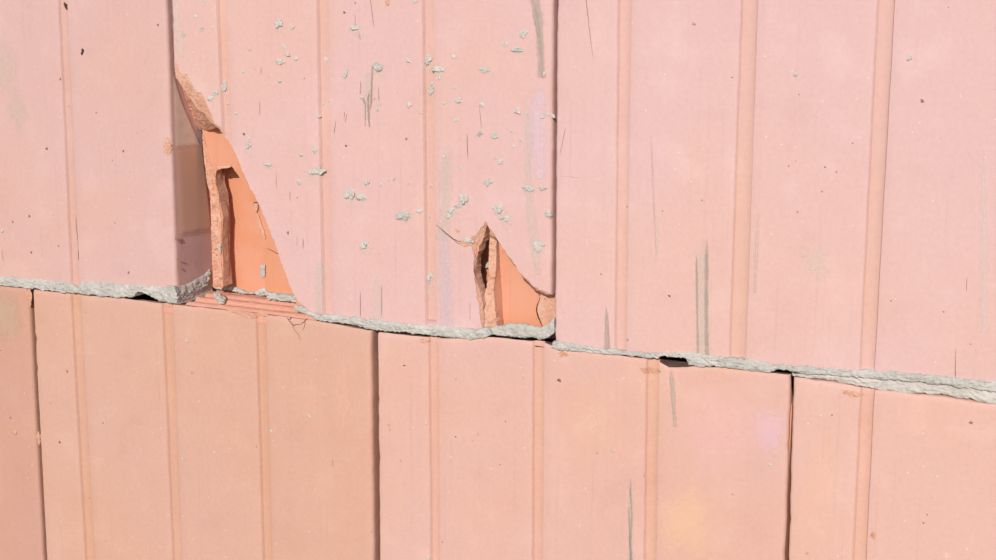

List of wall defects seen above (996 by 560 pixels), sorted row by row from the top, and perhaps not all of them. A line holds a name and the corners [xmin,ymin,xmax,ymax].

spalling [182,87,302,305]
spalling [481,231,556,339]